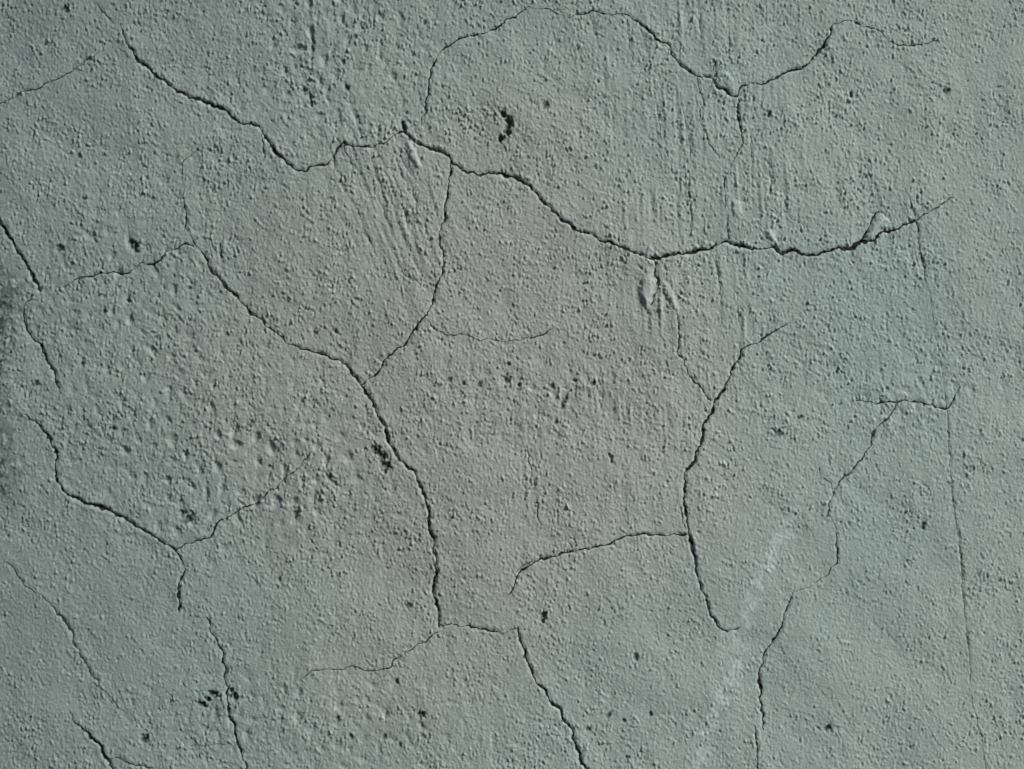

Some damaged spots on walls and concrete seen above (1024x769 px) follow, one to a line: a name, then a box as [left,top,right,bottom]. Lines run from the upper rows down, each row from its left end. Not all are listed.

crack [1,52,98,103]
crack [0,223,61,394]
crack [25,6,954,652]
crack [819,333,982,736]
crack [4,561,130,717]
crack [70,711,158,769]
crack [192,616,248,769]
crack [304,655,402,678]
crack [510,627,588,769]
crack [755,524,839,769]